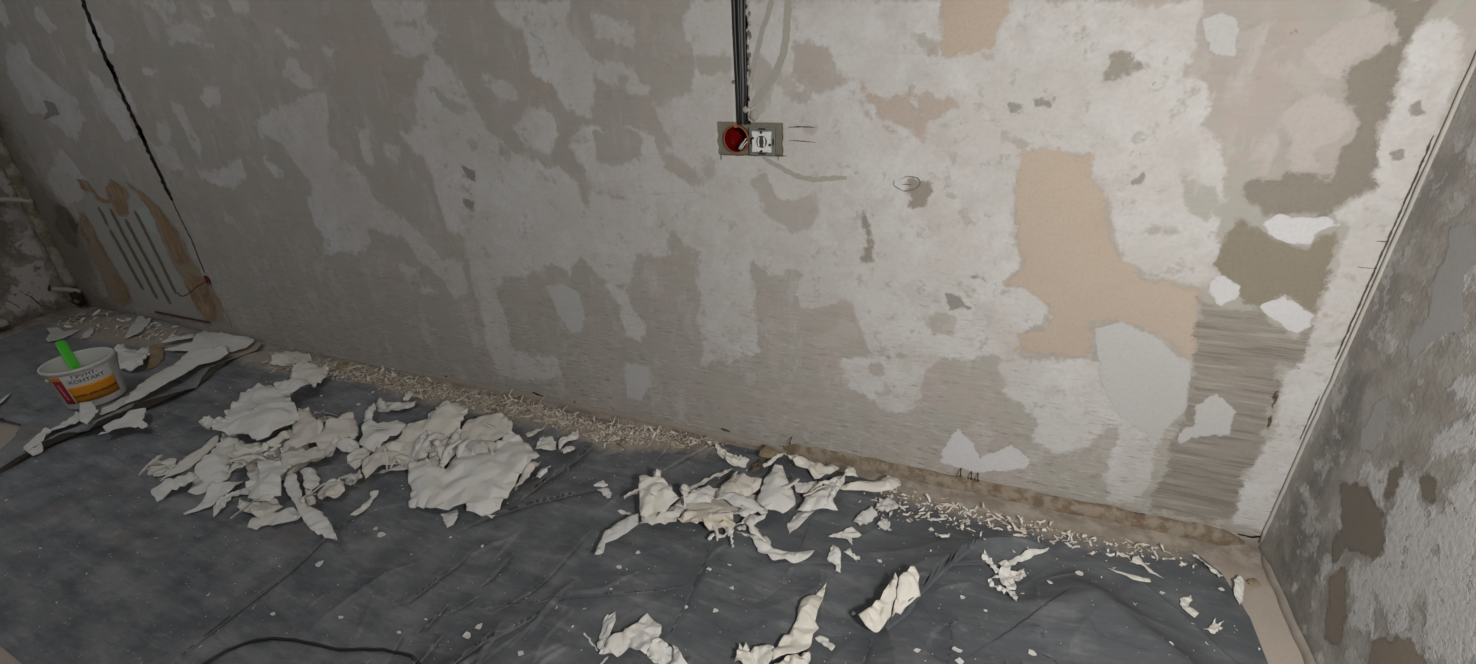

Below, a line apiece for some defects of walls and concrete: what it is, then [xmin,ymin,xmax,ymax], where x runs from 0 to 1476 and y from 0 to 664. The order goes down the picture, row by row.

crack [81,0,205,273]
peeling [859,80,963,144]
peeling [937,0,1011,59]
peeling [1150,0,1437,524]
peeling [1323,457,1438,646]
peeling [1368,635,1428,664]